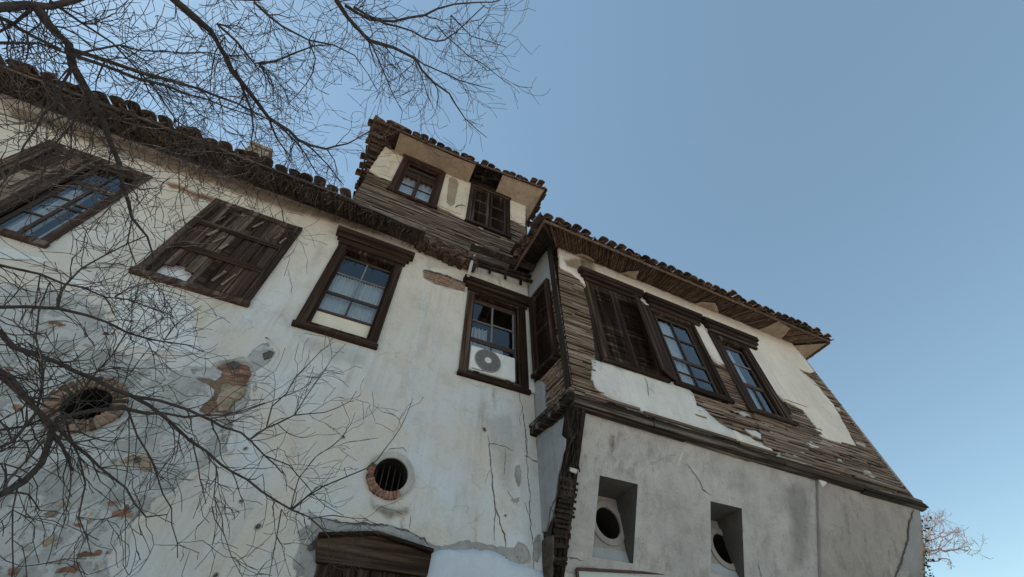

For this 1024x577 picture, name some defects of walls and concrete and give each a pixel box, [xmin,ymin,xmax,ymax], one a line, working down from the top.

flaking render [56,337,279,577]
peeling [293,509,543,577]
crack [485,394,560,569]
crack [896,511,914,576]